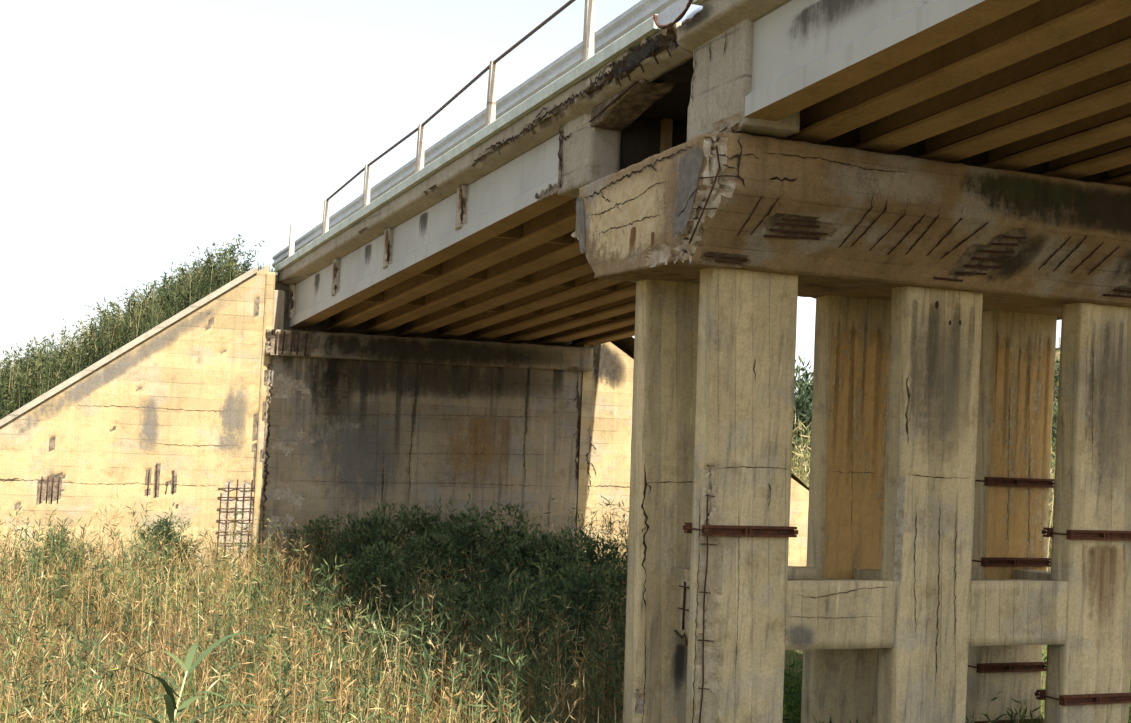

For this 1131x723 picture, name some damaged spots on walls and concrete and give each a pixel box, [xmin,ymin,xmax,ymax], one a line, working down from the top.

spalling [471,19,686,201]
crack [479,30,698,236]
crack [691,32,726,103]
crack [722,136,989,259]
damp [967,174,1131,233]
spalling [36,472,65,505]
damp [144,405,156,442]
spalling [144,463,178,509]
damp [221,396,243,447]
spalling [216,329,361,574]
crack [0,358,701,723]
damp [284,336,541,498]